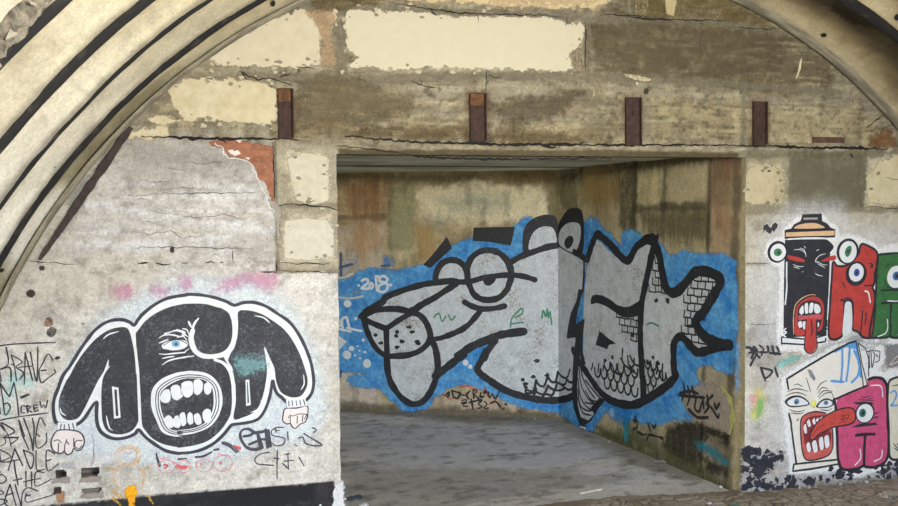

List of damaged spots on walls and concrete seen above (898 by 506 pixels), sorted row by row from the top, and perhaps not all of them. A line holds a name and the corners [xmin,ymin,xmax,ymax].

spalling [0,0,52,67]
corrosion [278,88,291,102]
peeling [128,0,612,141]
crack [337,116,891,161]
peeling [209,140,339,266]